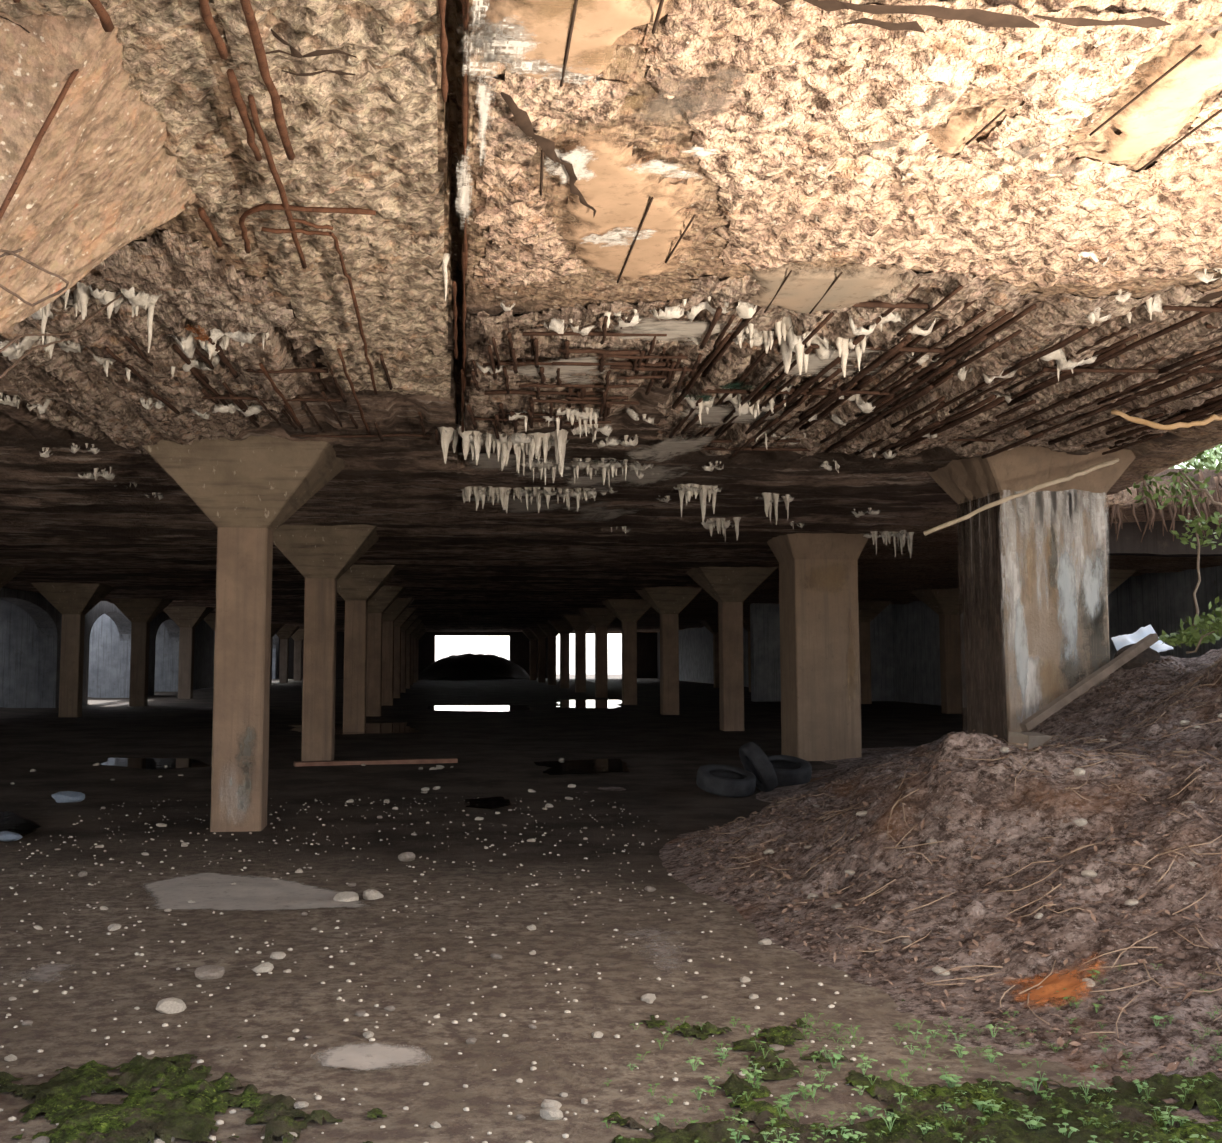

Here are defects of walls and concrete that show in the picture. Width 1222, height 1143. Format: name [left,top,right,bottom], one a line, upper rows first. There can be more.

corrosion [438,0,469,186]
spalling [0,0,1222,460]
water stain [0,392,51,414]
water stain [0,282,161,381]
water stain [140,398,165,410]
water stain [168,324,272,377]
water stain [191,403,263,419]
corrosion [452,214,468,453]
water stain [437,296,940,540]
water stain [957,489,1111,742]